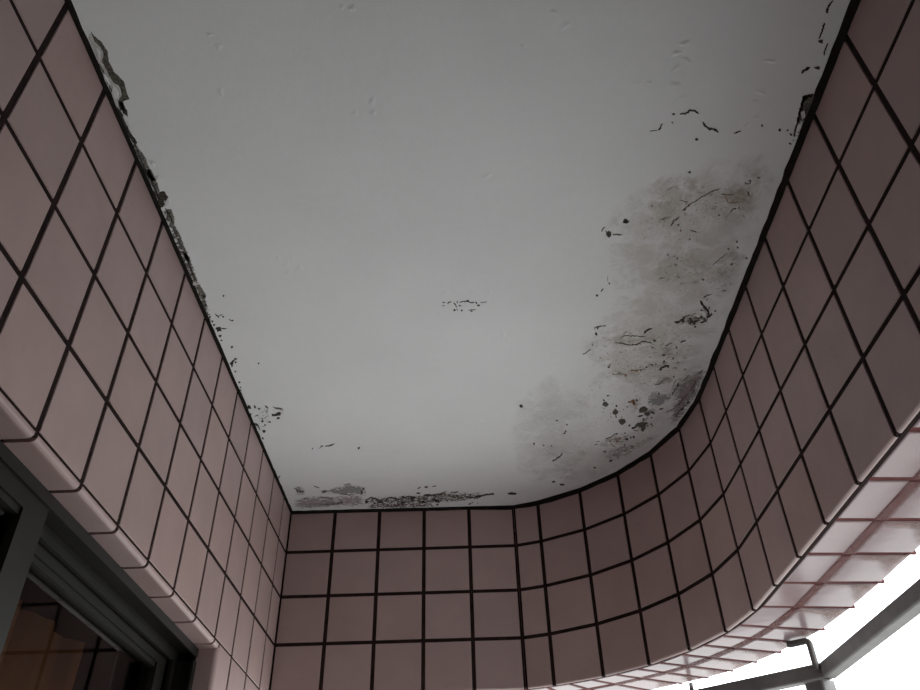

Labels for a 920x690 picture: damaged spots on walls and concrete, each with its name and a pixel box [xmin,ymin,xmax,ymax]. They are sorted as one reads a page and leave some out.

flaking render [89,32,210,320]
peeling [247,405,284,439]
damp [602,367,703,432]
flaking render [365,486,494,508]